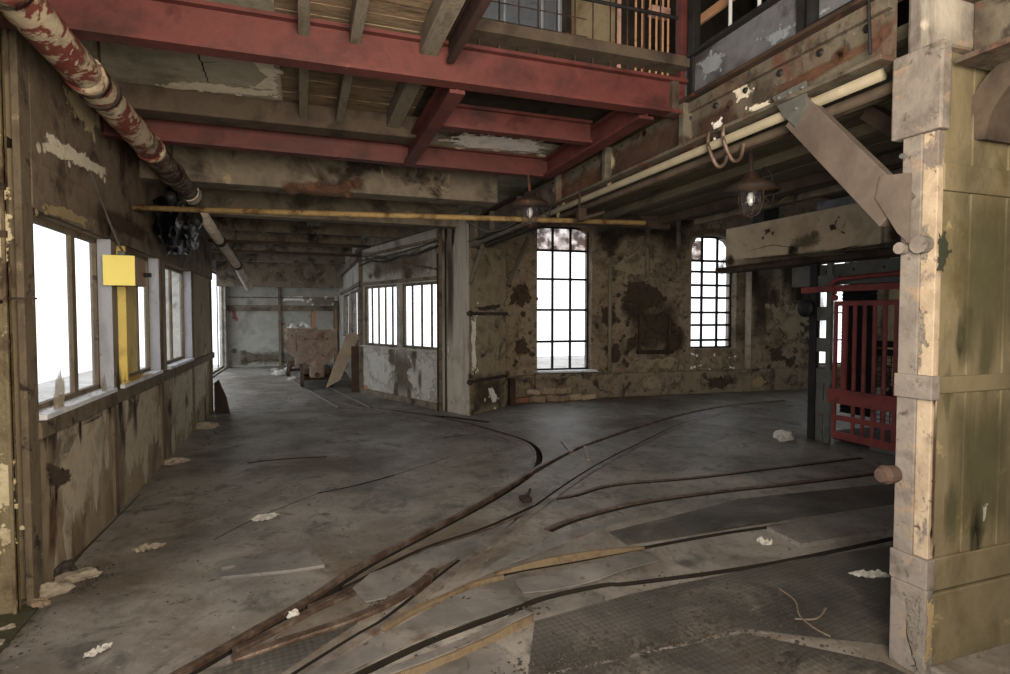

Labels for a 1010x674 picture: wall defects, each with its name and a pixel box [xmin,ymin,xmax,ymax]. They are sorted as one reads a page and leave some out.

peeling [155,62,285,98]
peeling [696,49,725,80]
peeling [732,84,770,111]
peeling [36,132,106,183]
peeling [436,132,546,157]
rust [284,178,362,198]
damp [718,257,733,274]
peeling [447,281,538,414]
damp [389,346,421,398]
peeling [407,353,437,401]
peeling [0,460,24,555]
damp [966,416,1003,551]